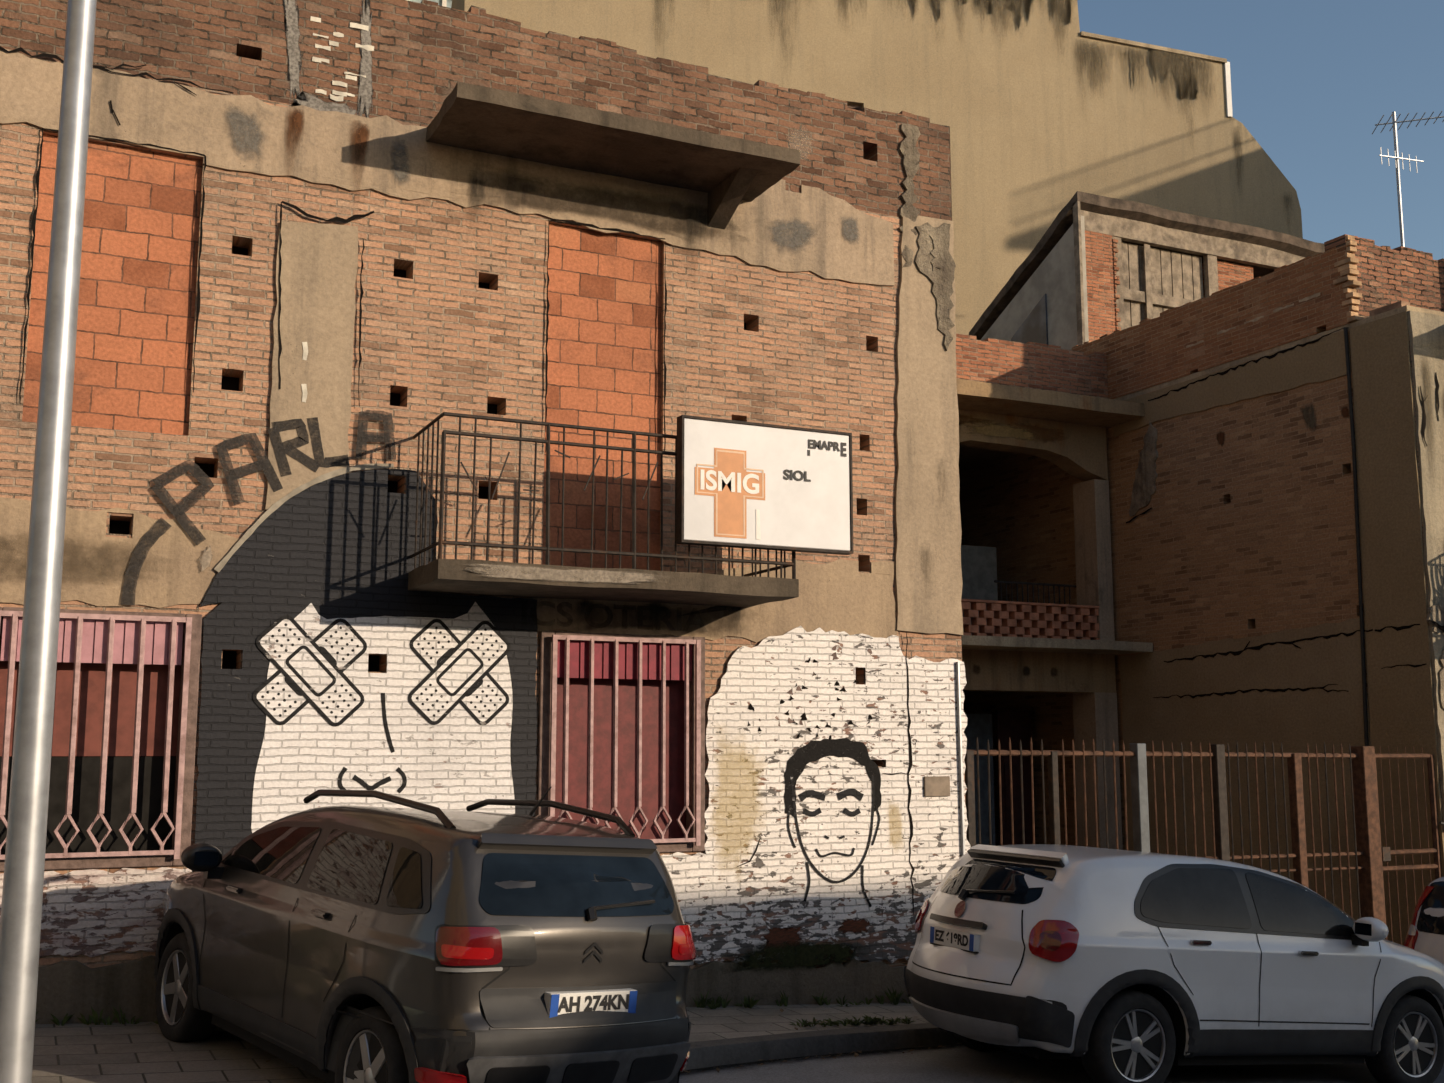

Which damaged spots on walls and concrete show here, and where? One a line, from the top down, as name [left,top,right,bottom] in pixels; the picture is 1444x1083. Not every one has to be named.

spalling [283,0,374,118]
damp [1078,44,1100,80]
damp [1129,50,1209,96]
damp [227,111,262,153]
spalling [898,124,956,351]
peeling [778,646,881,739]
crack [1153,620,1444,698]
spalling [1426,604,1444,710]
peeling [763,927,802,946]
peeling [839,919,870,933]